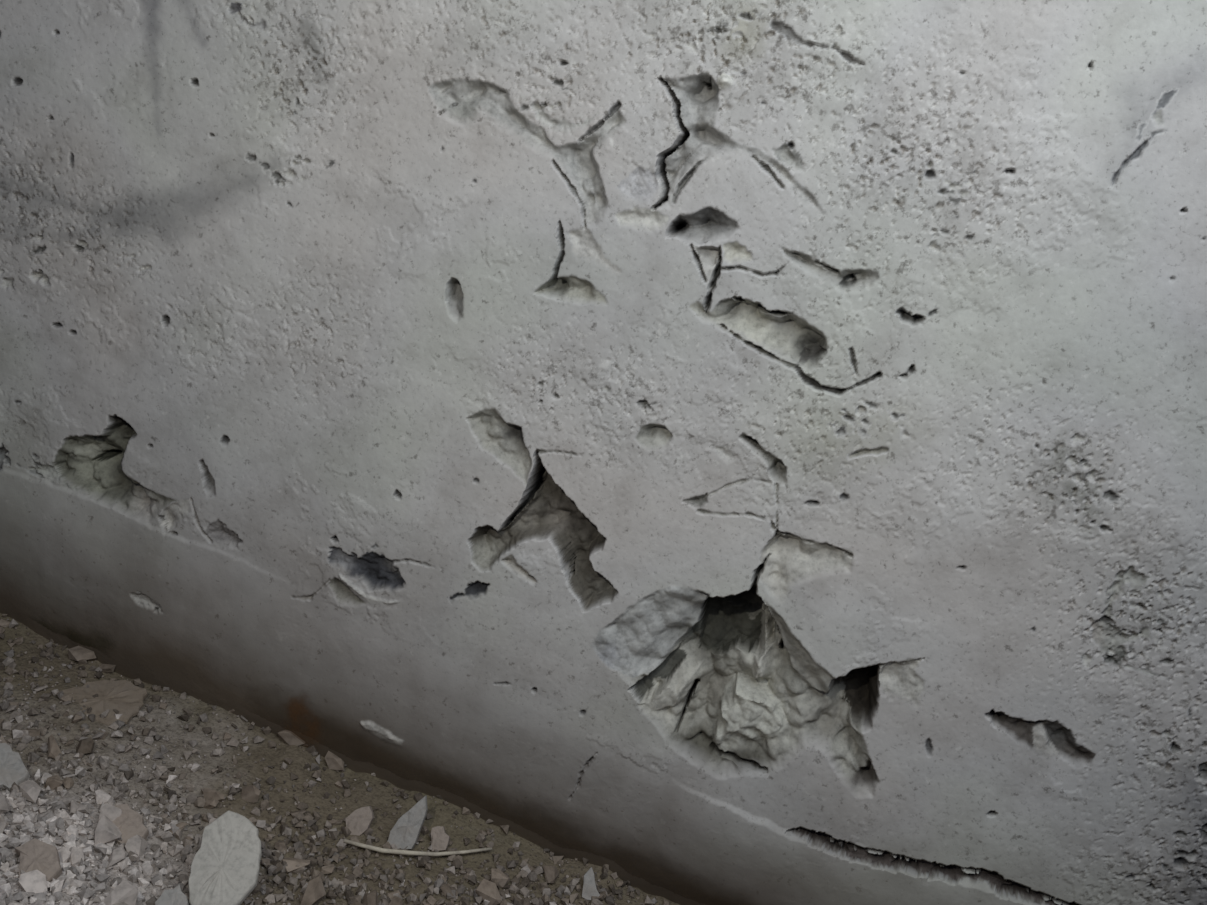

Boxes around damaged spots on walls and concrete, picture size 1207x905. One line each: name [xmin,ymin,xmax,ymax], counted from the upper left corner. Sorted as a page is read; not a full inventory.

spalling [426,8,918,441]
flaking render [919,159,994,267]
spalling [894,304,941,328]
spalling [26,414,244,552]
flaking render [290,535,406,610]
spalling [446,407,927,800]
spalling [983,709,1098,770]
crack [785,826,1079,905]